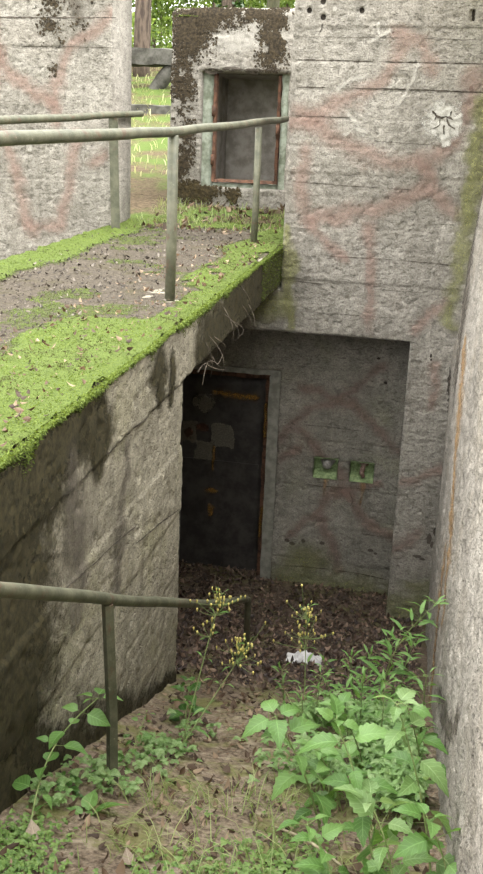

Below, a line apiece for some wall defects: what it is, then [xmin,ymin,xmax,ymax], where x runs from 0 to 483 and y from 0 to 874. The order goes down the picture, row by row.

water stain [151,346,176,407]